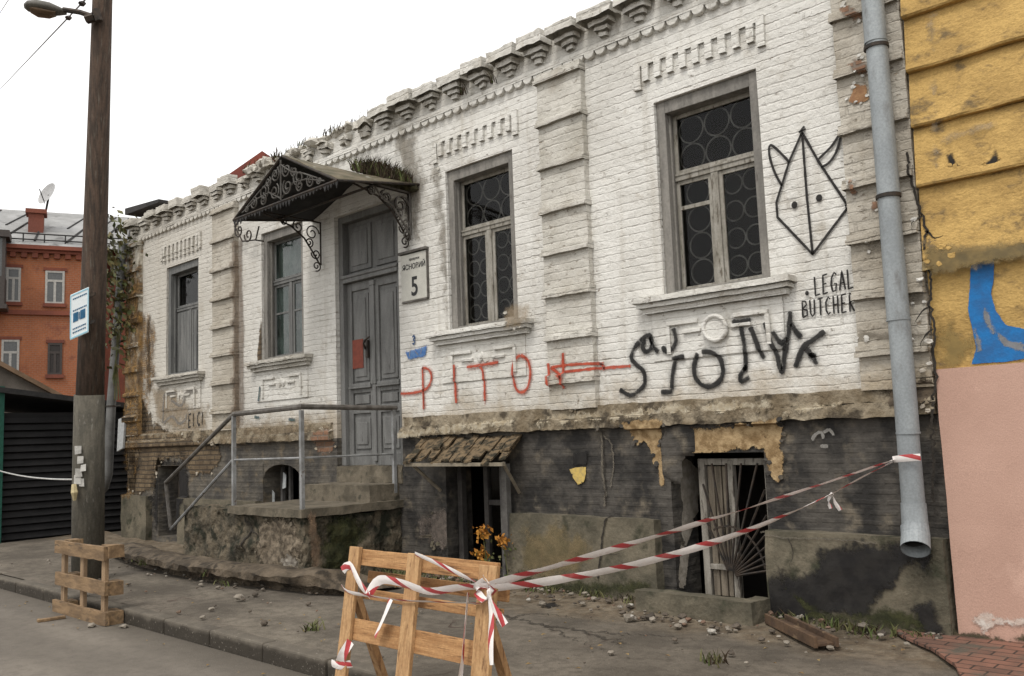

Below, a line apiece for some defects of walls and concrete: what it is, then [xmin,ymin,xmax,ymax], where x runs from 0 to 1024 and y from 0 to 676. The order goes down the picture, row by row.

spalling [845,54,869,104]
peeling [121,399,221,495]
flaking render [533,399,844,589]
damp [768,539,931,620]
damp [911,601,1024,641]